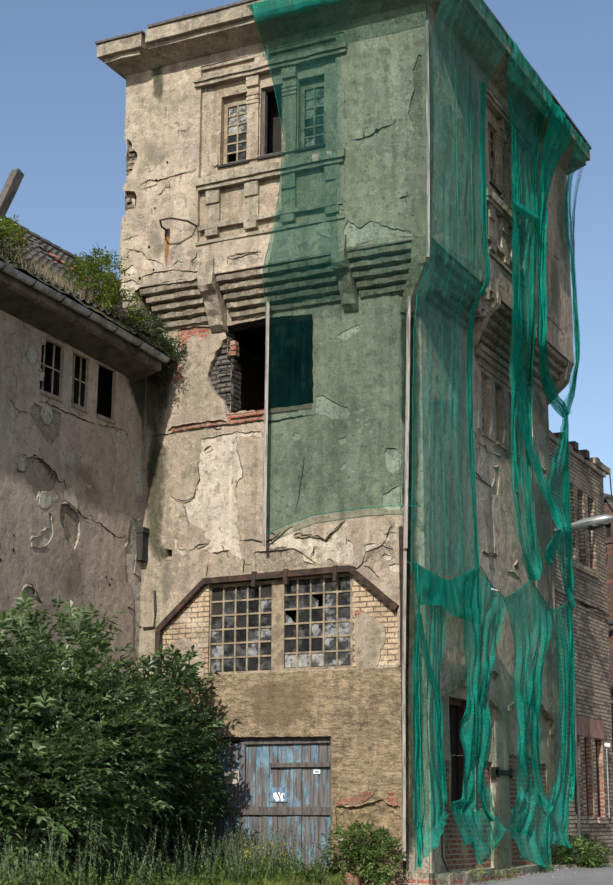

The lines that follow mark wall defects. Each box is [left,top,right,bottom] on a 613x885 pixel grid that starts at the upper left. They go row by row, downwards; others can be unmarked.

flaking render [174,325,217,385]
peeling [169,340,350,560]
peeling [255,521,354,573]
flaking render [365,531,399,572]